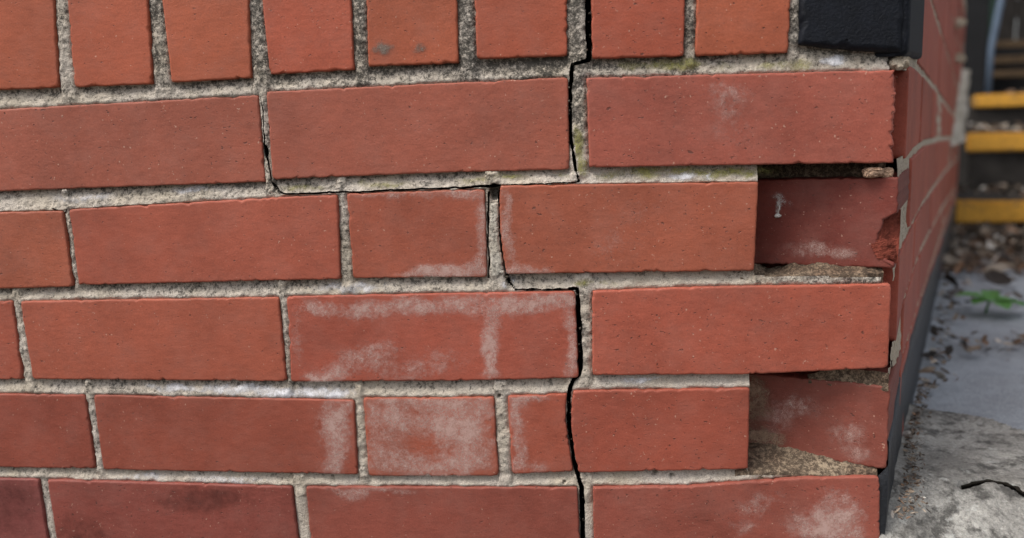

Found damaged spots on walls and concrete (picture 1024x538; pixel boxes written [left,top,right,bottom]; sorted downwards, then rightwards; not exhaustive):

crack [260,0,592,538]
spalling [871,209,901,263]
damp [409,399,480,471]